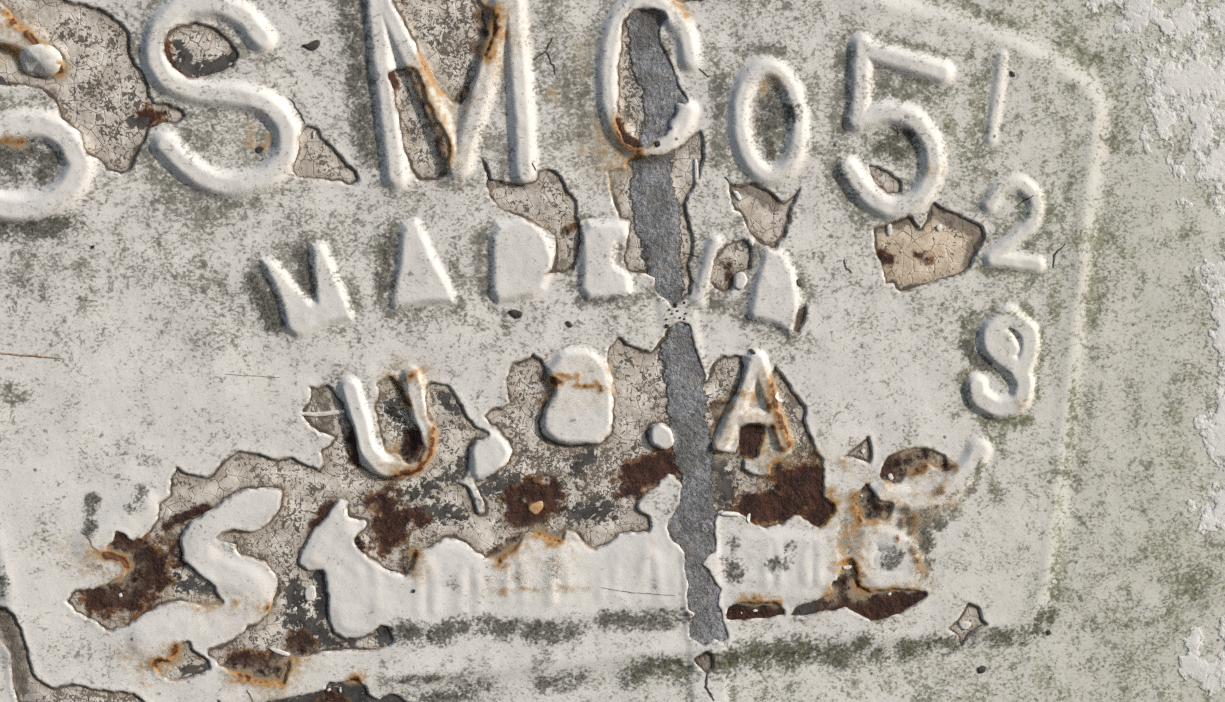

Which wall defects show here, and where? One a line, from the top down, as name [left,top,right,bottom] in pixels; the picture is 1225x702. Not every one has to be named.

peeling [0,0,184,174]
peeling [164,23,238,78]
peeling [388,0,491,181]
peeling [67,126,703,681]
peeling [698,349,834,528]
corrosion [81,544,134,582]
corrosion [408,547,425,578]
corrosion [490,526,566,571]
corrosion [737,593,784,607]
peeling [726,565,927,621]
corrosion [822,447,960,599]
peeling [0,607,143,702]